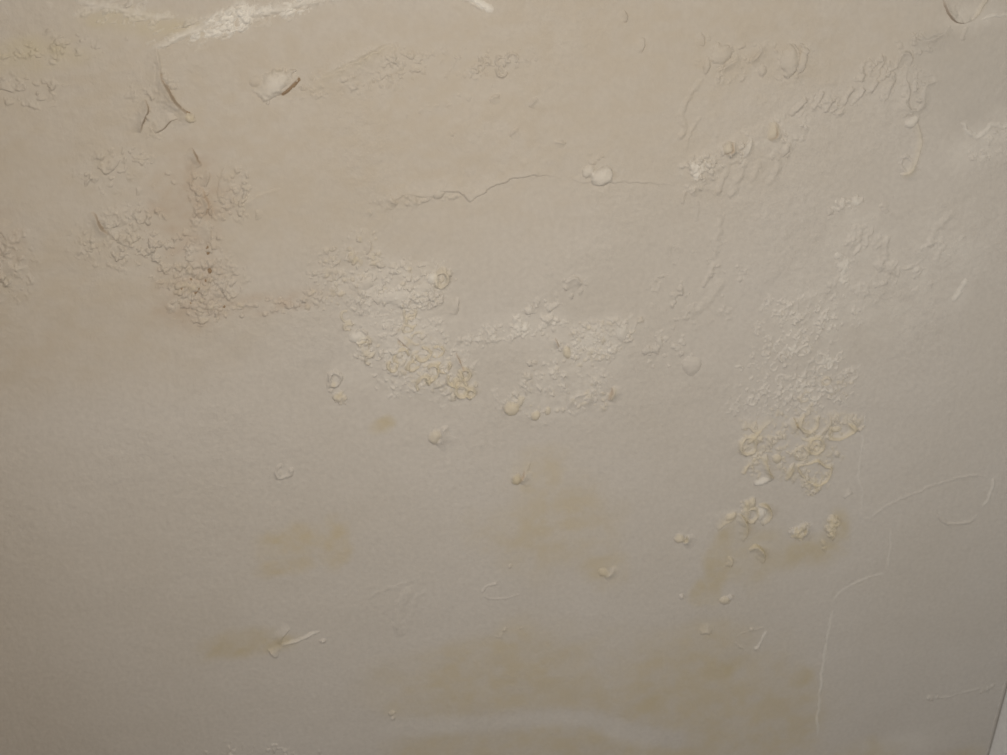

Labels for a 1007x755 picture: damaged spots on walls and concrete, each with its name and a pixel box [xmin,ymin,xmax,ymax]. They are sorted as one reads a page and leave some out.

damp [332,602,863,755]